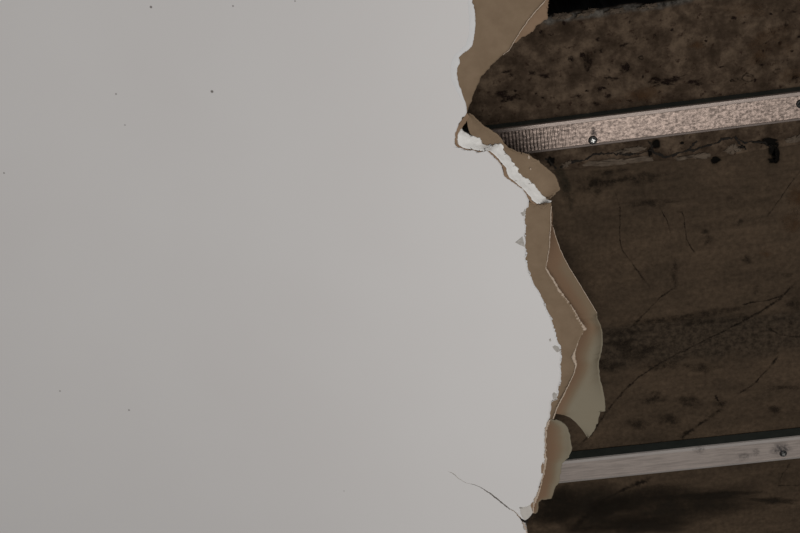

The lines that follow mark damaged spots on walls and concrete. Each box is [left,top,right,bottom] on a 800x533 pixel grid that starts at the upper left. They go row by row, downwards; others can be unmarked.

spalling [551,7,626,25]
spalling [545,134,800,169]
crack [448,471,521,518]
spalling [520,505,533,533]